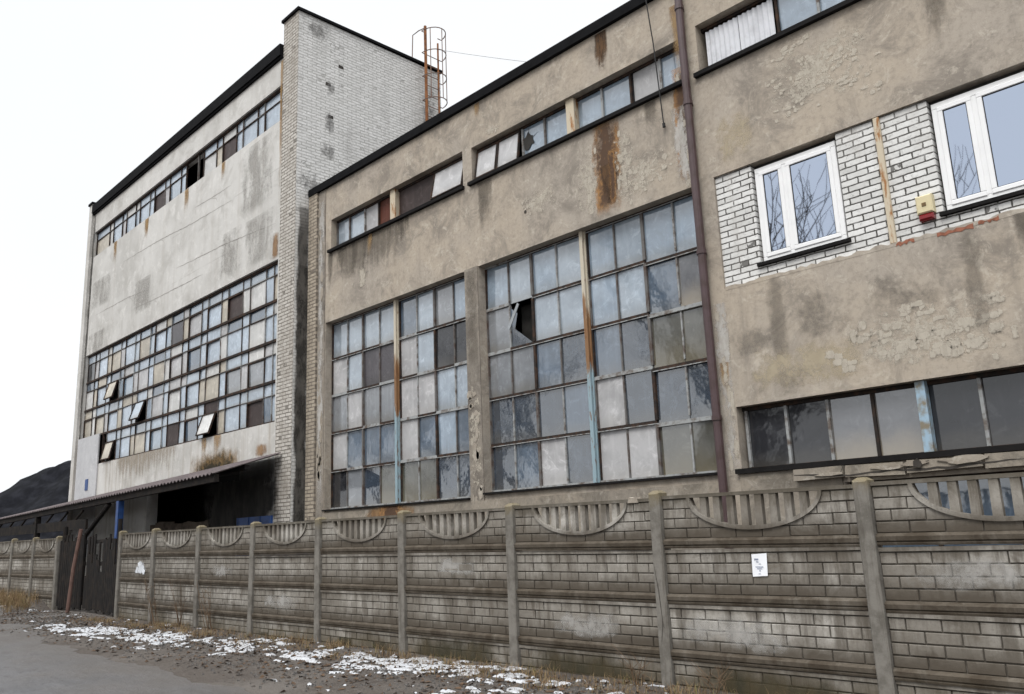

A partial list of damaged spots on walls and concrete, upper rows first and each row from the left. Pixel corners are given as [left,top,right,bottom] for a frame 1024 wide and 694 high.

rust [595,30,607,65]
peeling [766,29,883,123]
rust [592,123,621,210]
rust [672,68,691,187]
peeling [825,291,1019,373]
leakage [293,270,308,522]
spalling [467,387,483,501]
spalling [870,454,989,470]